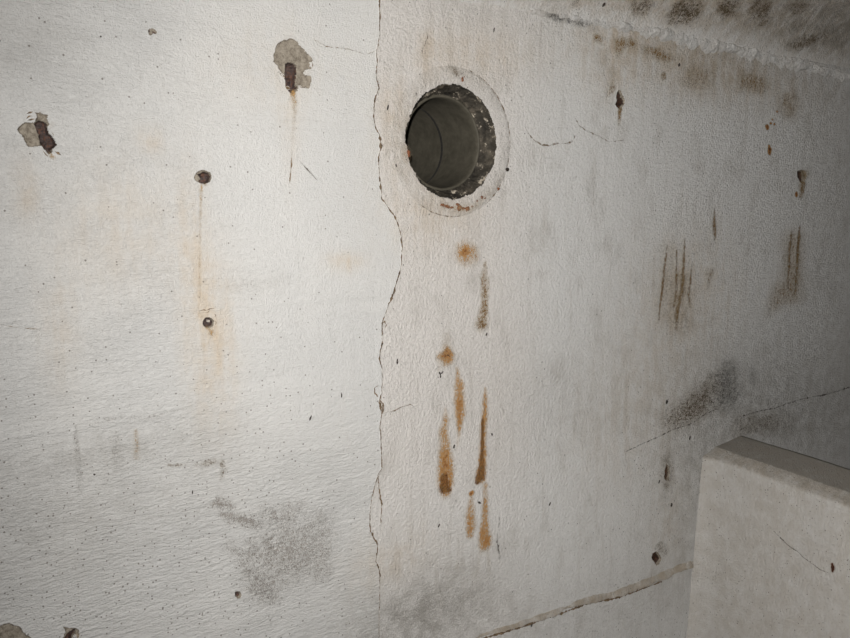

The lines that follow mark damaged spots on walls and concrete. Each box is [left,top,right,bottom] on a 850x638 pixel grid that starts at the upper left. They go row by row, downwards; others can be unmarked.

damp [668,0,703,24]
flaking render [268,32,318,103]
flaking render [9,105,64,161]
crack [359,0,411,638]
corrosion [477,274,489,329]
corrosion [438,346,453,363]
damp [667,362,740,430]
corrosion [438,372,465,496]
corrosion [466,394,491,550]
damp [212,498,259,528]
damp [233,505,329,594]
flaking render [649,544,664,569]